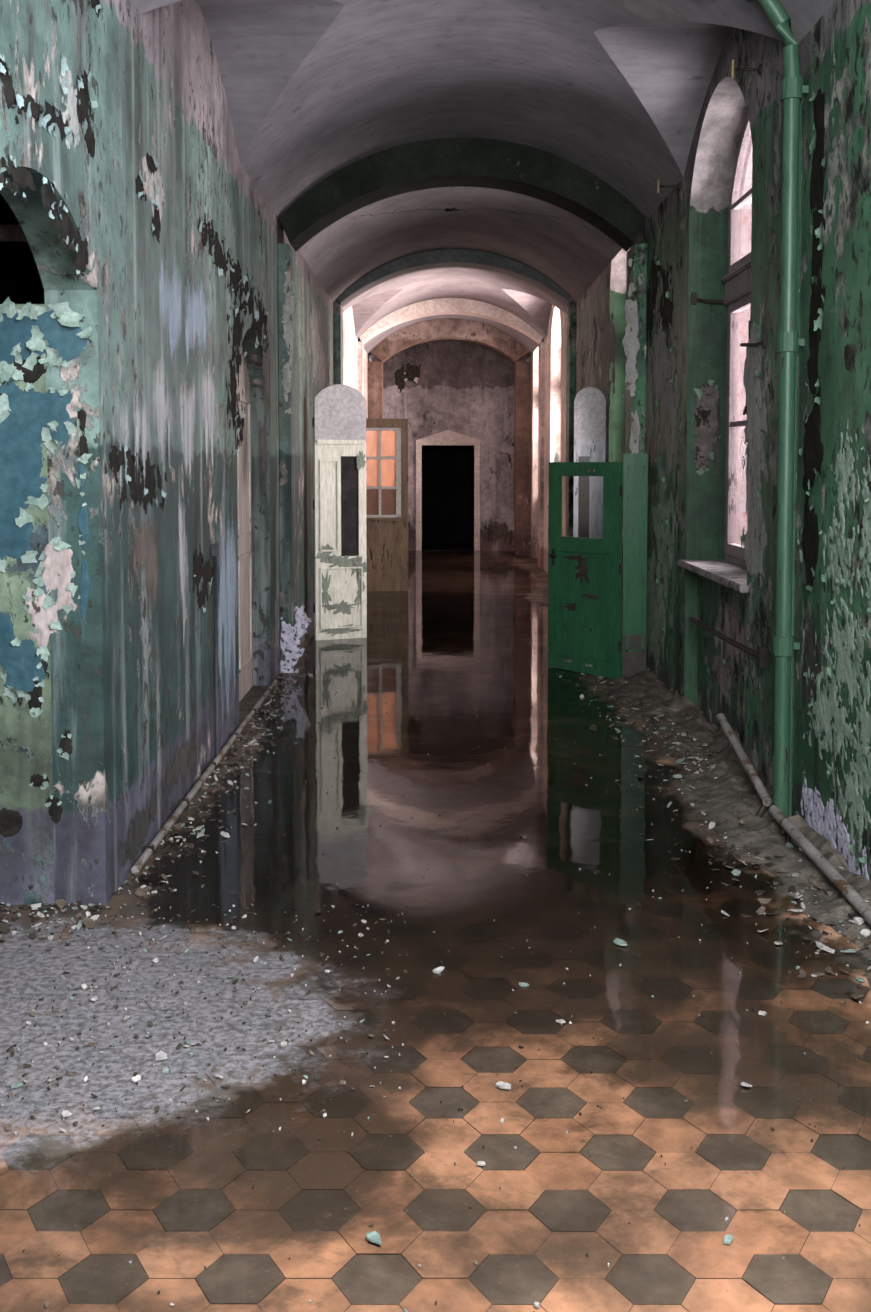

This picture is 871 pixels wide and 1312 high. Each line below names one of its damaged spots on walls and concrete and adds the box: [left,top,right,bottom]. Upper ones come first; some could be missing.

peeling [89,0,104,18]
peeling [0,53,98,159]
spalling [135,152,165,243]
peeling [199,214,327,454]
peeling [0,296,167,718]
peeling [796,88,871,880]
peeling [280,544,368,673]